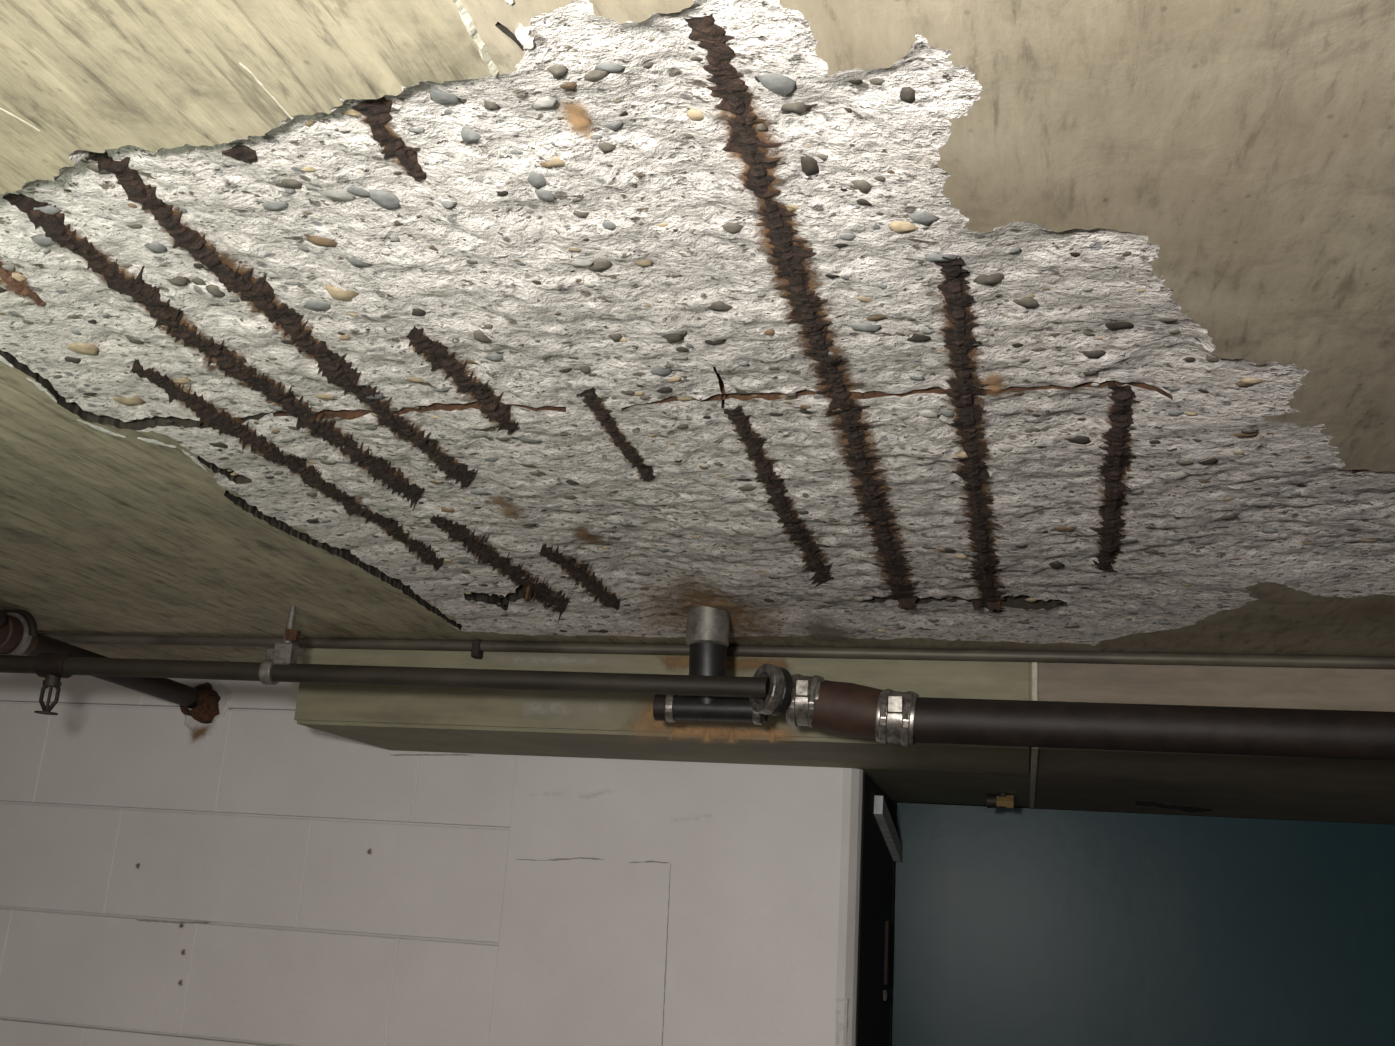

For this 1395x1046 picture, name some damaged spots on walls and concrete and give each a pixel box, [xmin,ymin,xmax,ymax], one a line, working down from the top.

corrosion [351,97,426,182]
corrosion [0,151,478,571]
crack [0,350,566,631]
corrosion [406,326,520,435]
corrosion [430,514,621,624]
corrosion [576,387,656,481]
spalling [0,0,1395,646]
crack [621,367,946,411]
corrosion [684,14,921,610]
corrosion [935,257,1006,613]
crack [983,381,1173,400]
corrosion [1090,381,1140,572]